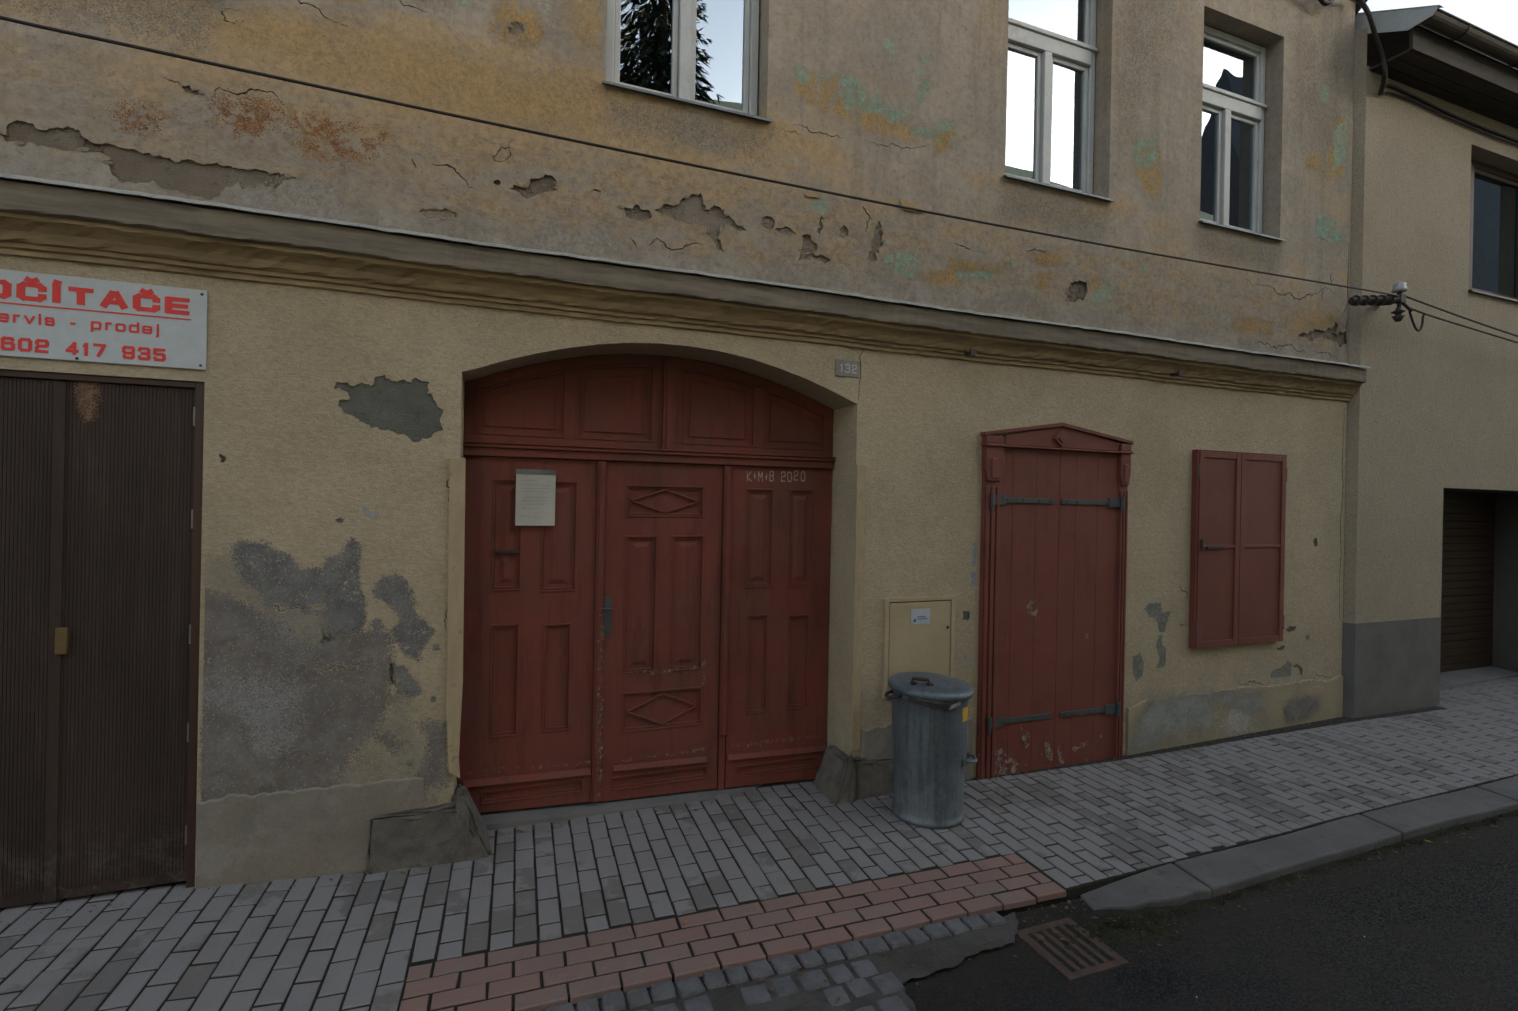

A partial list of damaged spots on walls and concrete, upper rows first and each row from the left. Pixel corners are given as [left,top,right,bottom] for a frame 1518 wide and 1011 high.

spalling [0,120,295,200]
spalling [493,175,557,199]
spalling [618,193,849,263]
spalling [868,222,885,262]
spalling [1298,320,1347,348]
spalling [334,375,447,442]
peeling [1132,602,1171,681]
peeling [1270,625,1310,678]